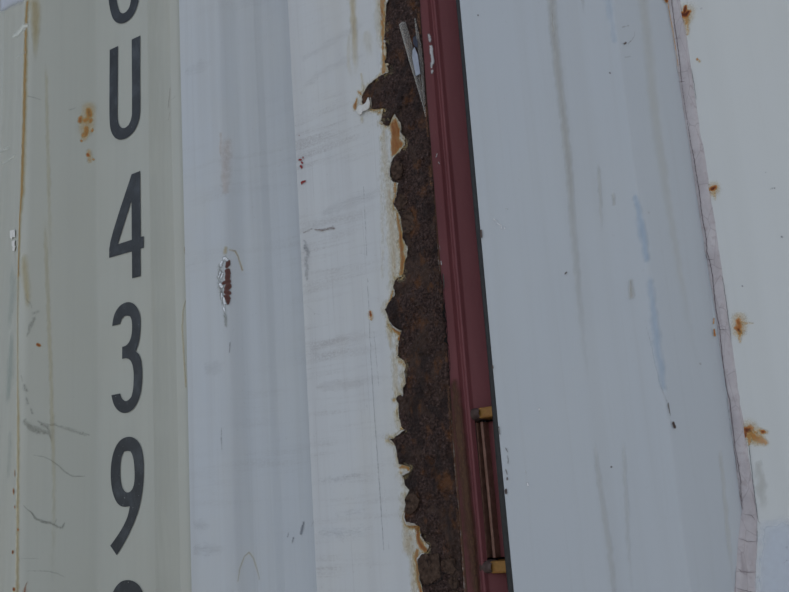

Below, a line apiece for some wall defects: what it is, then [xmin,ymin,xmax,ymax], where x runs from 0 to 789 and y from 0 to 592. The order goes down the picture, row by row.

rust [681,5,691,35]
rust [78,108,93,142]
peeling [218,257,232,312]
rust [353,0,464,592]
rust [734,317,743,338]
rust [744,424,767,445]